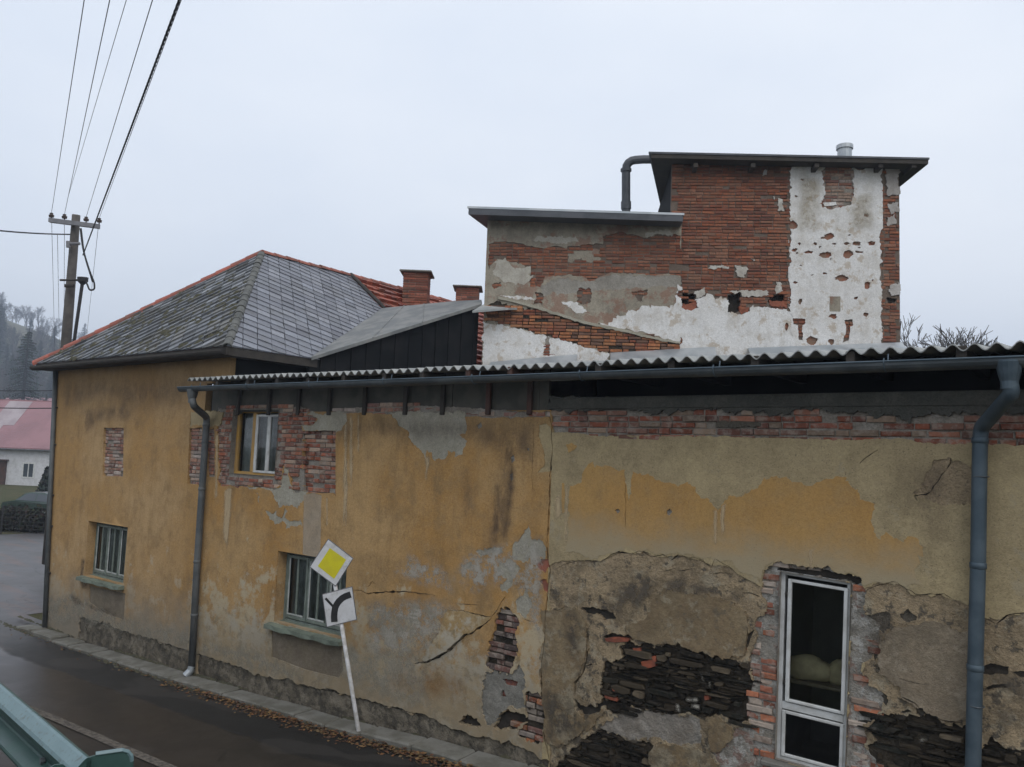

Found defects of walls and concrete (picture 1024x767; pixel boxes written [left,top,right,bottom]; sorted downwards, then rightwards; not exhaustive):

flaking render [484,164,901,356]
flaking render [189,402,981,557]
flaking render [988,412,1024,446]
crack [418,604,489,663]
peeling [461,457,971,767]
flaking render [982,613,1024,751]